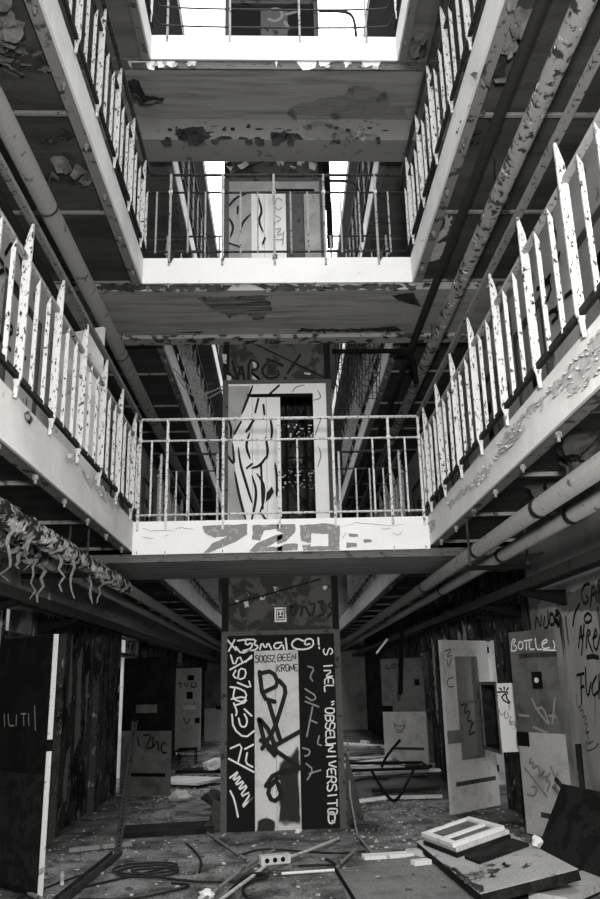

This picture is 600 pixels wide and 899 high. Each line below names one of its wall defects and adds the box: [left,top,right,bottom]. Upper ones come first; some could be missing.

peeling [0,0,54,77]
peeling [470,0,532,87]
peeling [128,61,197,70]
peeling [123,79,165,109]
peeling [160,121,388,147]
peeling [468,108,494,147]
peeling [428,214,453,264]
peeling [100,281,421,320]
peeling [447,329,600,510]